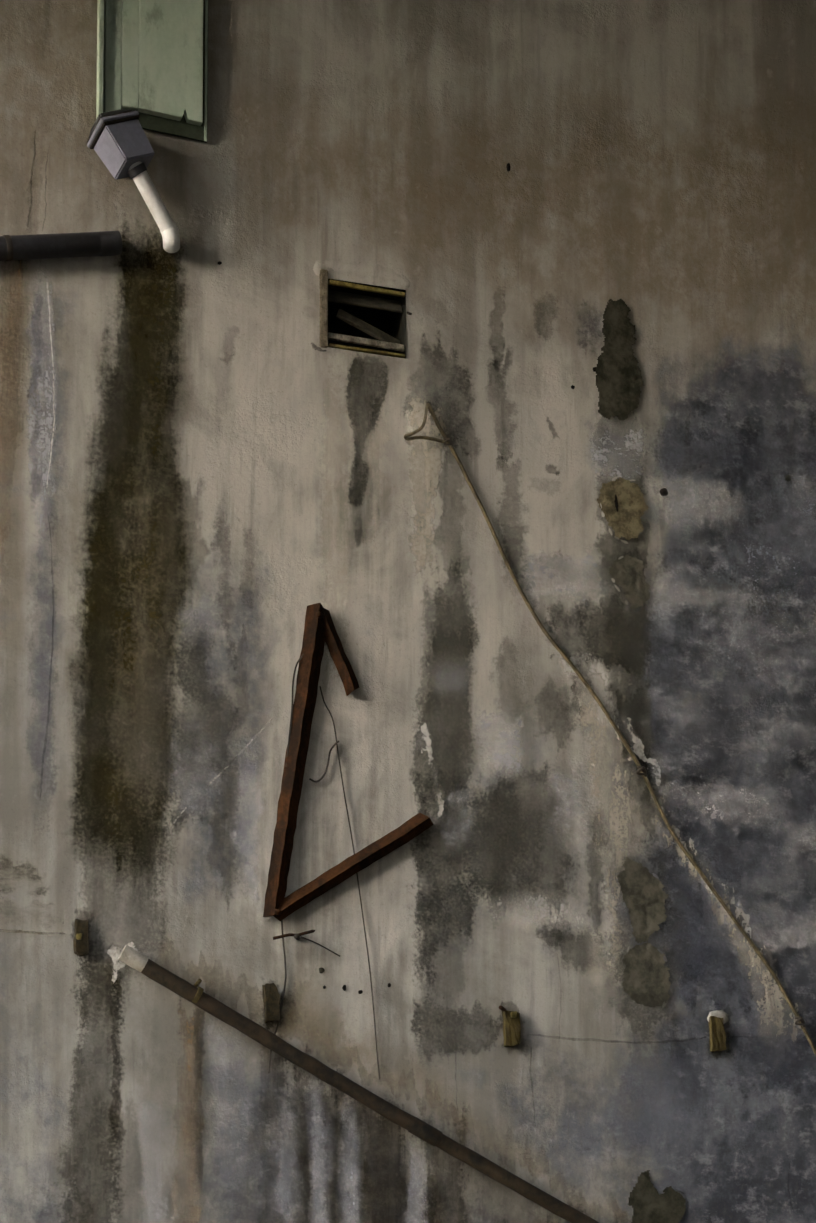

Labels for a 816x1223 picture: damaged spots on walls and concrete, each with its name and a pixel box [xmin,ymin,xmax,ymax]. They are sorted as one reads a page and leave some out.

damp [346,356,388,506]
spalling [595,299,645,420]
damp [70,235,238,874]
spalling [597,476,650,609]
damp [76,959,122,1043]
spalling [617,857,674,1008]
damp [65,1048,120,1223]
damp [294,1067,407,1223]
spalling [628,1170,686,1223]